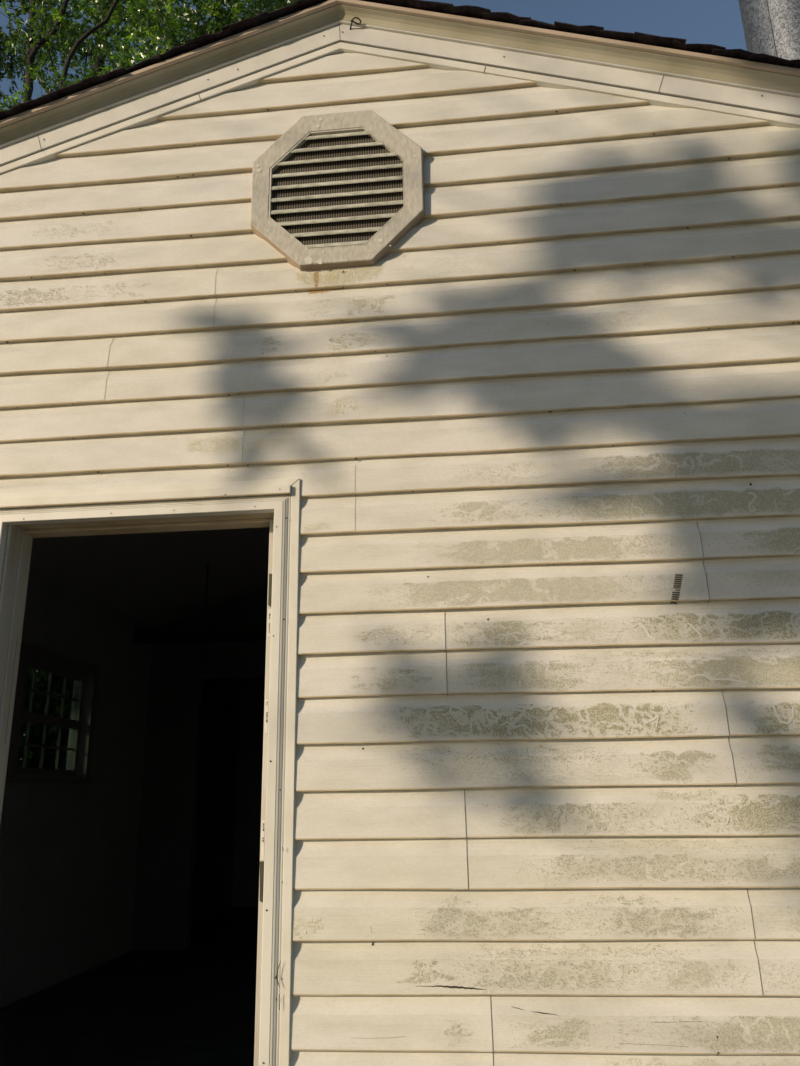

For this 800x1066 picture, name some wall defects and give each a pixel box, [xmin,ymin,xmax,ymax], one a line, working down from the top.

corrosion [309,271,345,293]
leakage [579,448,800,479]
leakage [431,487,800,524]
leakage [411,527,800,566]
leakage [368,569,800,609]
leakage [351,611,800,995]
crack [416,983,487,991]
leakage [513,1015,800,1066]